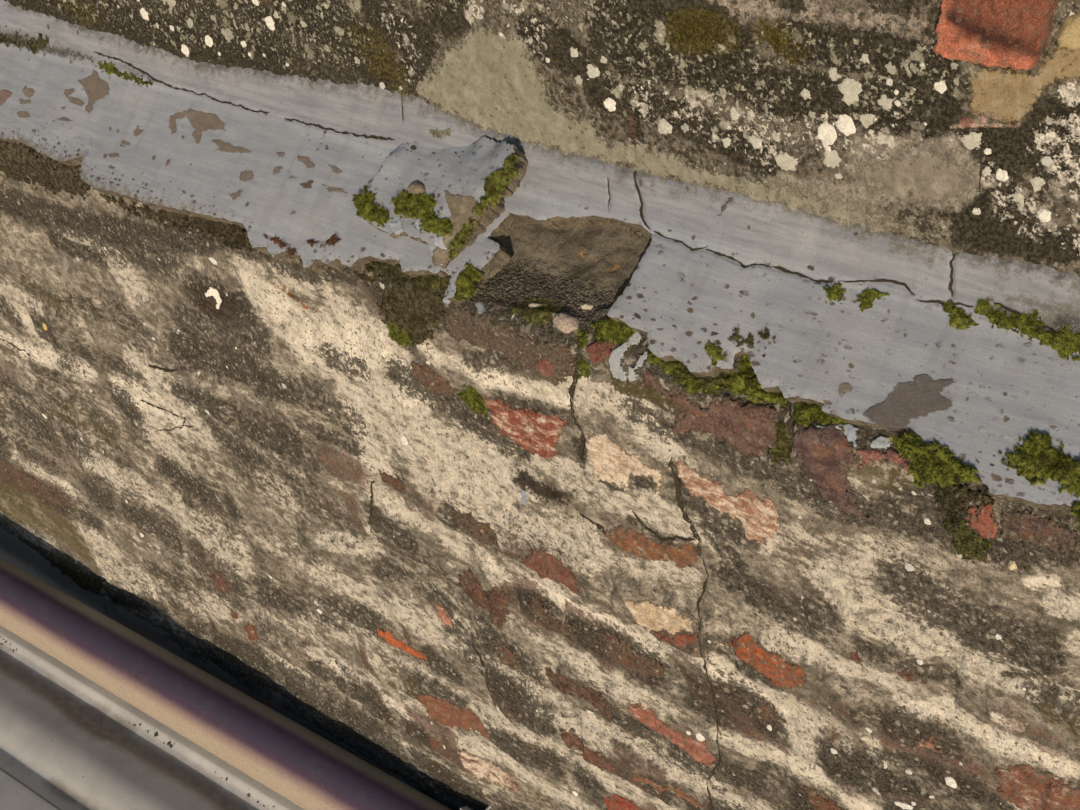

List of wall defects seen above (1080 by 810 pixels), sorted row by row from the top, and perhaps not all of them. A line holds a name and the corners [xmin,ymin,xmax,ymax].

crack [94,51,403,141]
spalling [84,180,245,228]
crack [607,110,1052,330]
spalling [253,137,954,522]
crack [568,332,586,459]
crack [579,513,605,535]
crack [632,457,721,810]